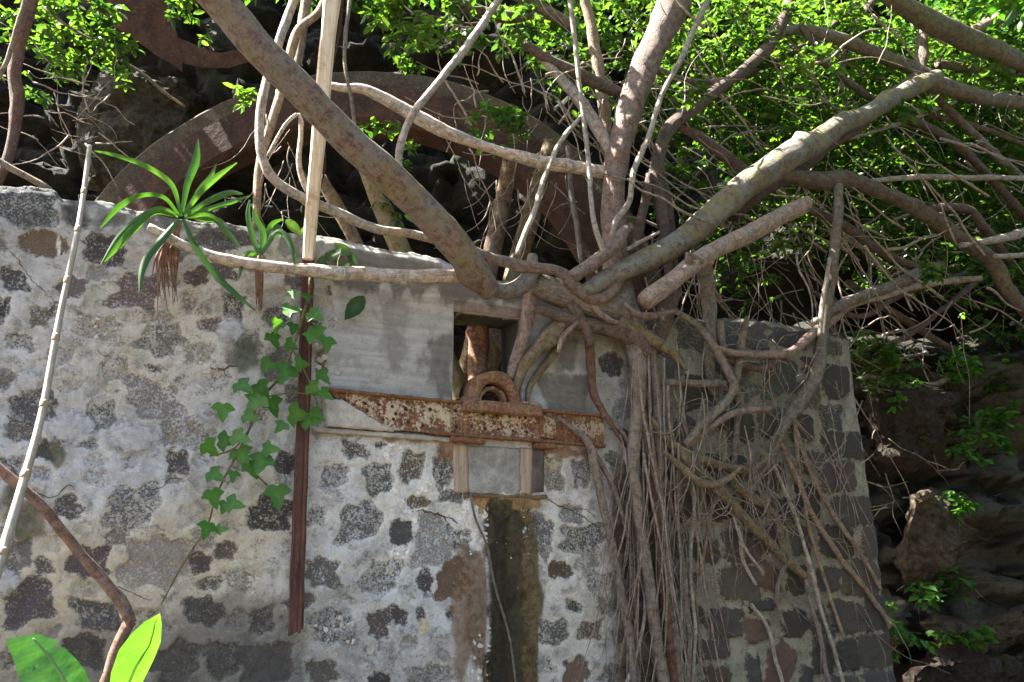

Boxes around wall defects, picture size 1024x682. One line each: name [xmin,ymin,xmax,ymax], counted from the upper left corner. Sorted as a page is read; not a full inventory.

corrosion [436,441,458,460]
corrosion [450,539,491,682]
water stain [482,503,544,682]